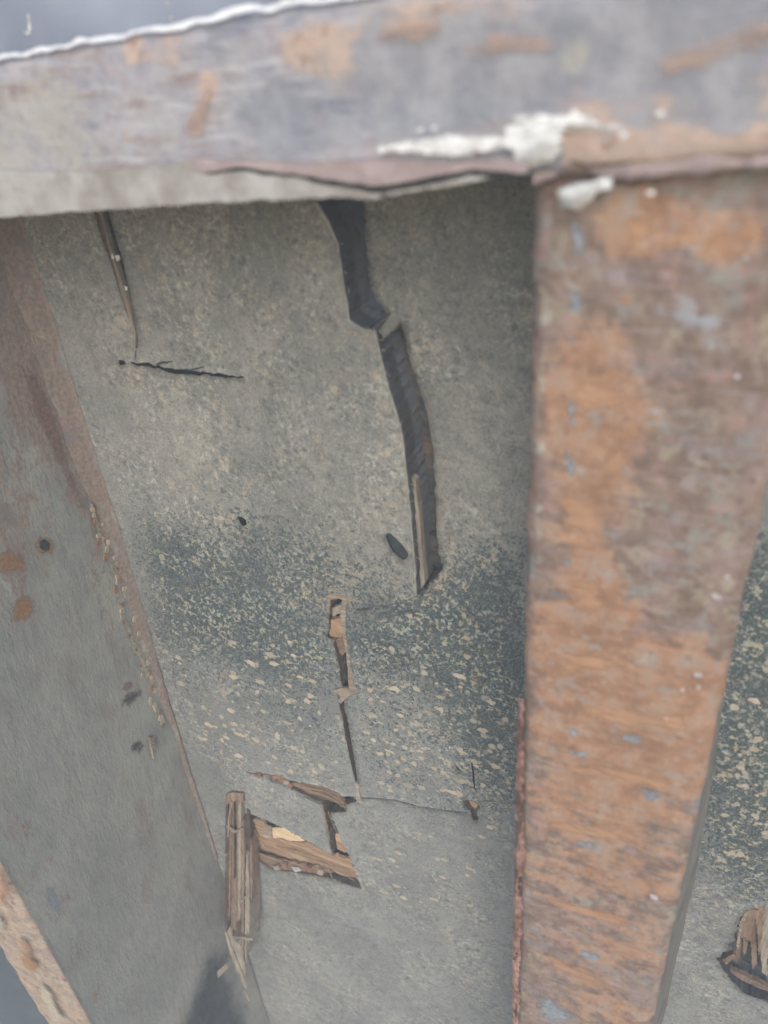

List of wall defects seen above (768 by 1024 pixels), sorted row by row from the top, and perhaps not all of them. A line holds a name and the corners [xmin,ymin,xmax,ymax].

crack [94,209,243,378]
crack [313,197,442,594]
spalling [197,644,361,888]
crack [326,593,362,803]
corrosion [512,696,526,1024]
spalling [717,906,768,1001]